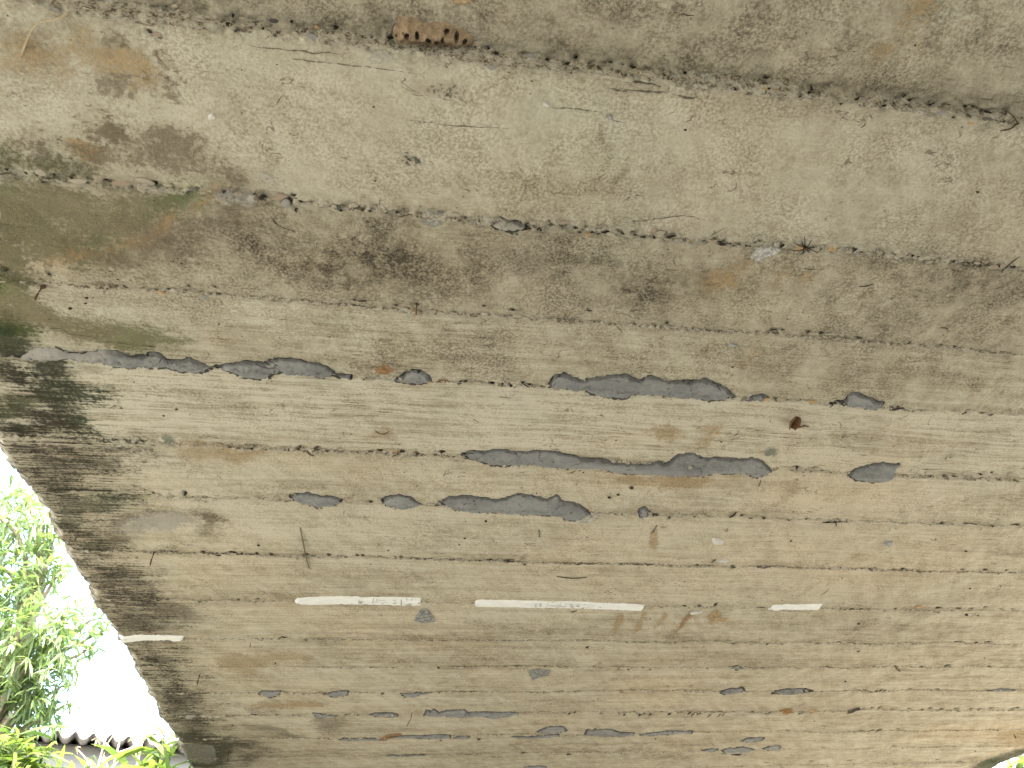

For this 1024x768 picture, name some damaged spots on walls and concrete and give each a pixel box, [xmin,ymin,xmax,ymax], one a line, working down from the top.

damp [89,49,187,104]
damp [0,116,250,768]